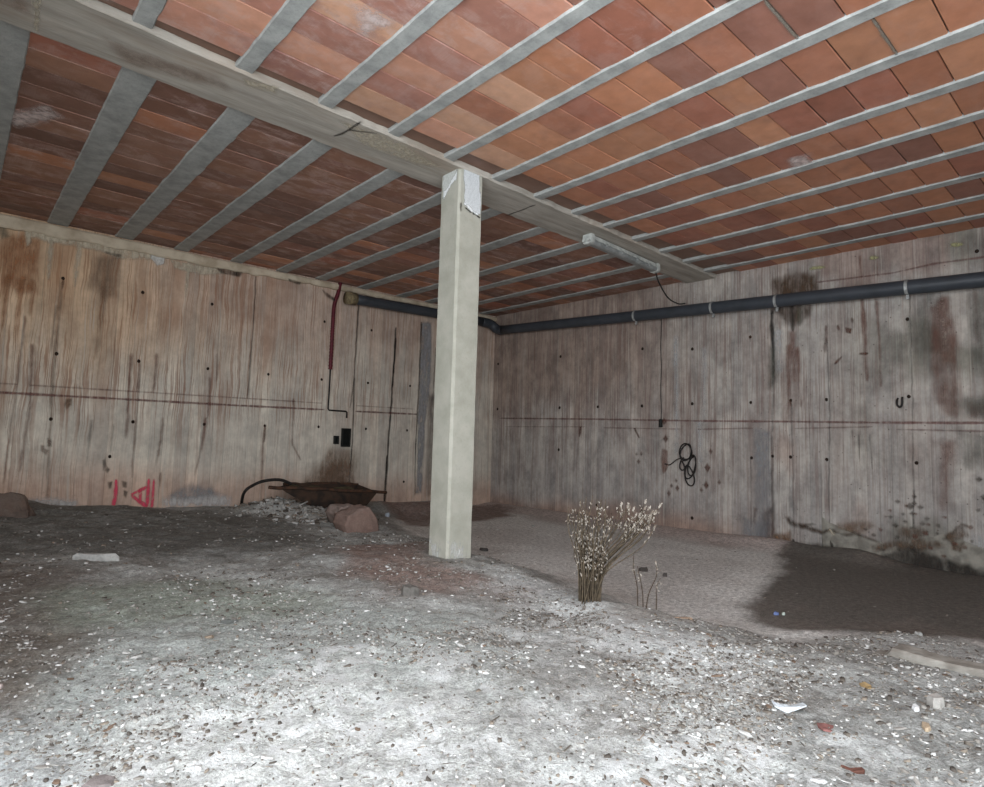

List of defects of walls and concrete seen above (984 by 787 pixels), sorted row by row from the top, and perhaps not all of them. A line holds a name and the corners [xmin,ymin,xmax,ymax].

spalling [442,169,481,218]
leakage [773,274,817,294]
leakage [885,548,984,577]